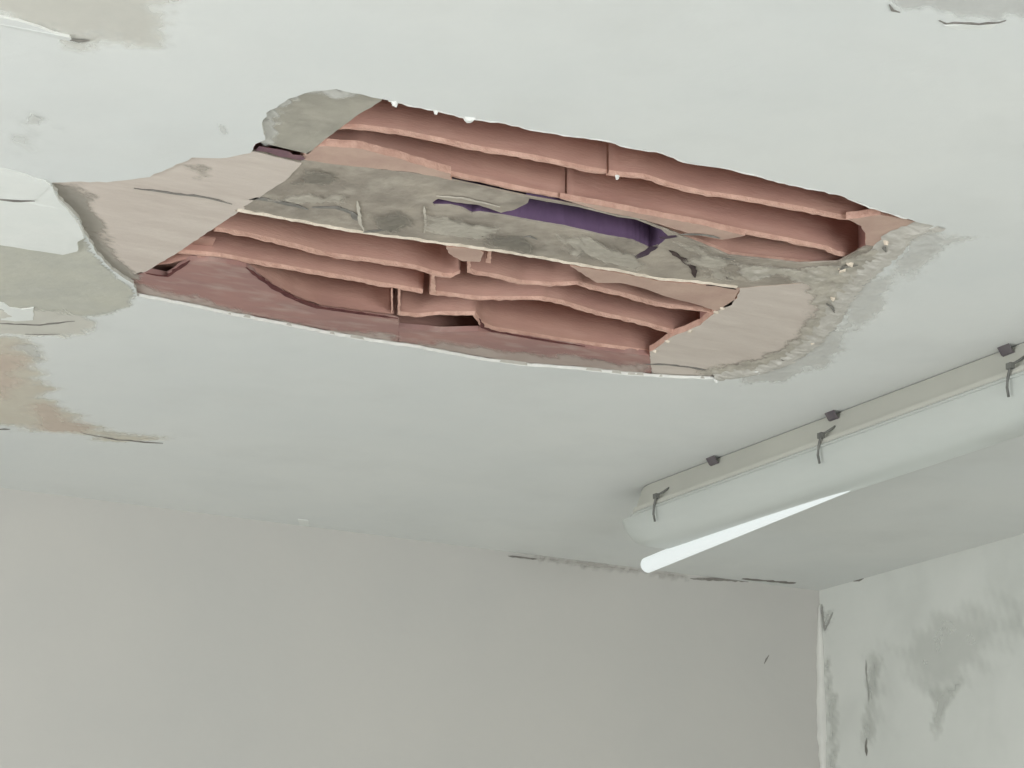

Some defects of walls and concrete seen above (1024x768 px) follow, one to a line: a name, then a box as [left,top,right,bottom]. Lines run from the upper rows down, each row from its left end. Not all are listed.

spalling [0,100,954,383]